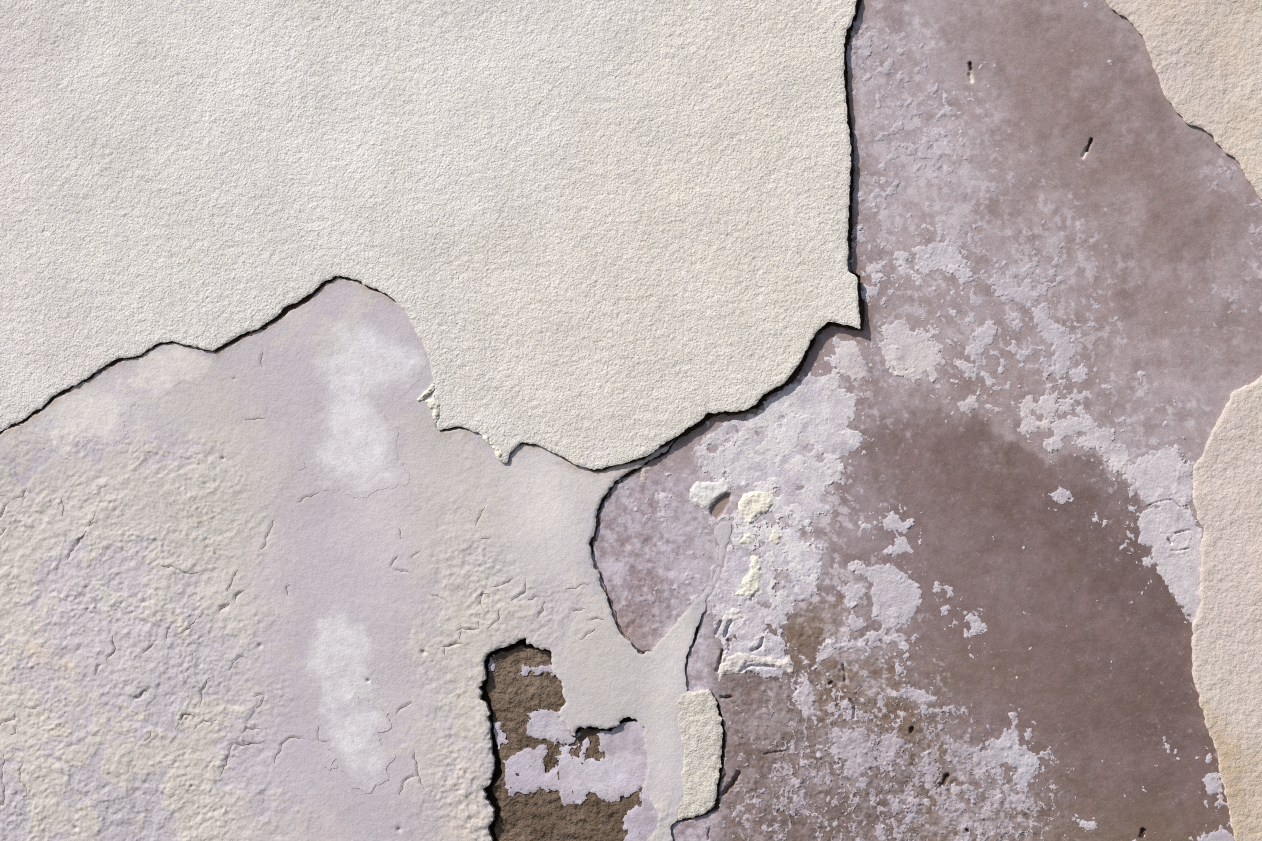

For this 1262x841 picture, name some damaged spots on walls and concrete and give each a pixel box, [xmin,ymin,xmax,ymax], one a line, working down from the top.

spalling [590,0,1262,841]
crack [61,500,95,559]
spalling [0,276,723,841]
crack [0,707,35,805]
crack [94,571,325,777]